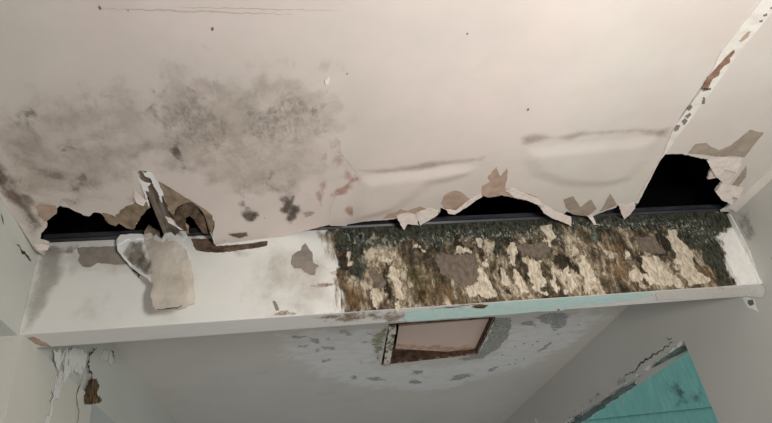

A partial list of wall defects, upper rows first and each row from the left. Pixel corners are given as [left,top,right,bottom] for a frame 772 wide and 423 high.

peeling [702,50,735,104]
mould [0,172,36,222]
peeling [133,171,164,206]
peeling [166,202,268,253]
mould [281,197,313,221]
peeling [396,194,482,230]
peeling [506,189,635,226]
peeling [688,130,764,205]
peeling [67,246,140,277]
spalling [291,243,319,275]
leakage [321,211,758,312]
leakage [261,305,626,397]